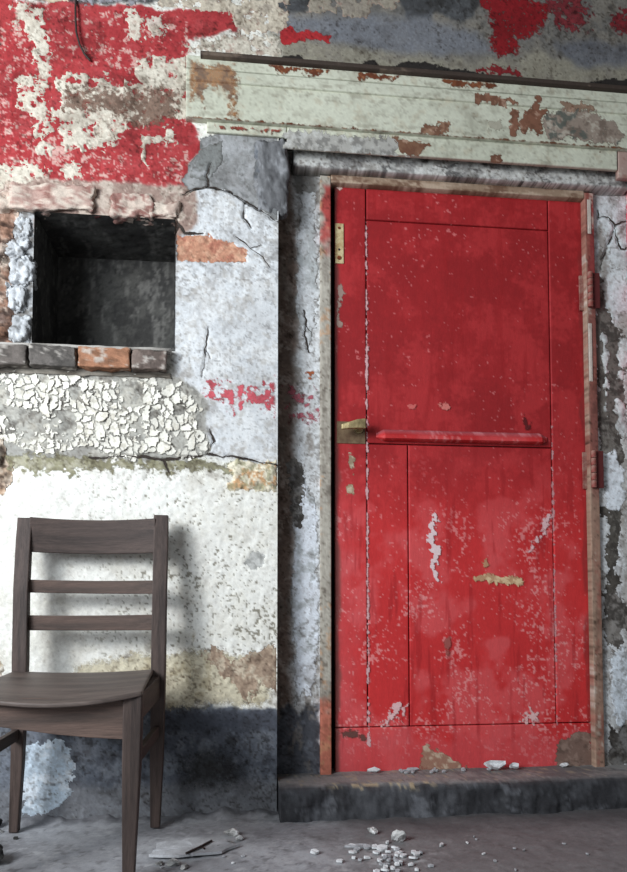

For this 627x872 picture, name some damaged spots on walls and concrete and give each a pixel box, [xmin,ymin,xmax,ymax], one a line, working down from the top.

peeling [0,0,331,190]
peeling [475,92,625,147]
spalling [0,211,38,343]
crack [174,217,204,235]
flaking render [176,233,247,263]
crack [182,162,279,268]
peeling [294,191,320,349]
peeling [0,369,275,495]
crack [88,429,281,475]
spalling [595,272,627,765]
water stain [77,646,151,673]
water stain [165,650,270,711]